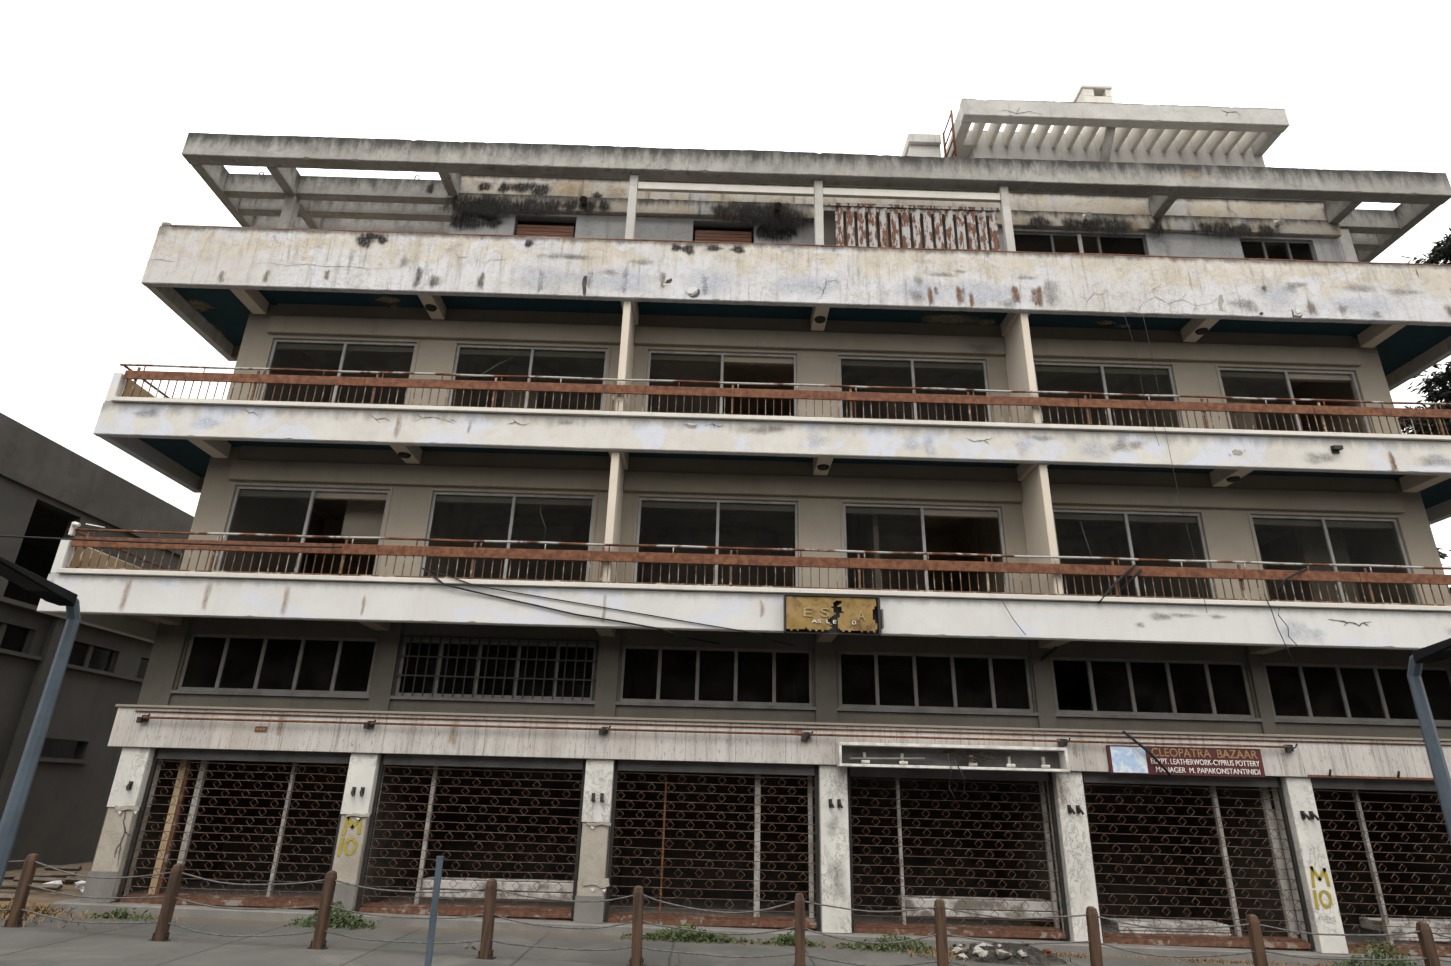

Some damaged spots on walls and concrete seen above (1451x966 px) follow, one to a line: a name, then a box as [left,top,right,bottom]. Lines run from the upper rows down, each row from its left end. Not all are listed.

water stain [427,182,609,230]
water stain [712,201,807,240]
water stain [357,233,387,248]
corrosion [1012,286,1042,305]